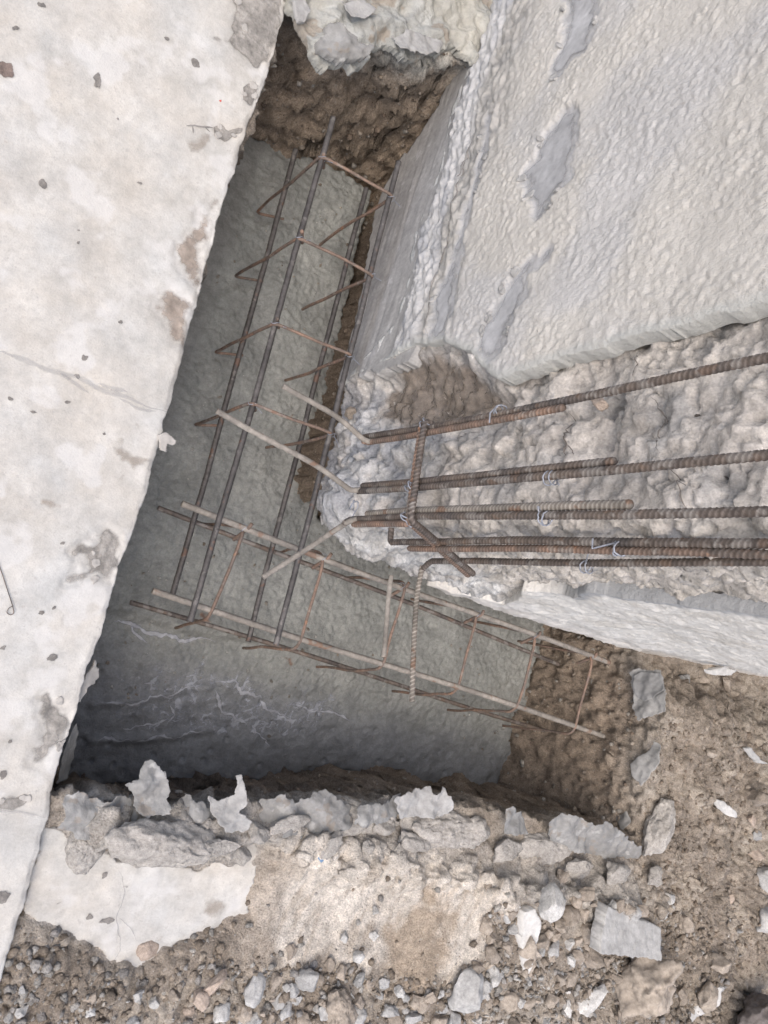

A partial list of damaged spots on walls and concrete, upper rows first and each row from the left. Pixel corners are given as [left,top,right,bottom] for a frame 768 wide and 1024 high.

peeling [548,0,597,82]
peeling [516,113,574,217]
peeling [479,262,530,354]